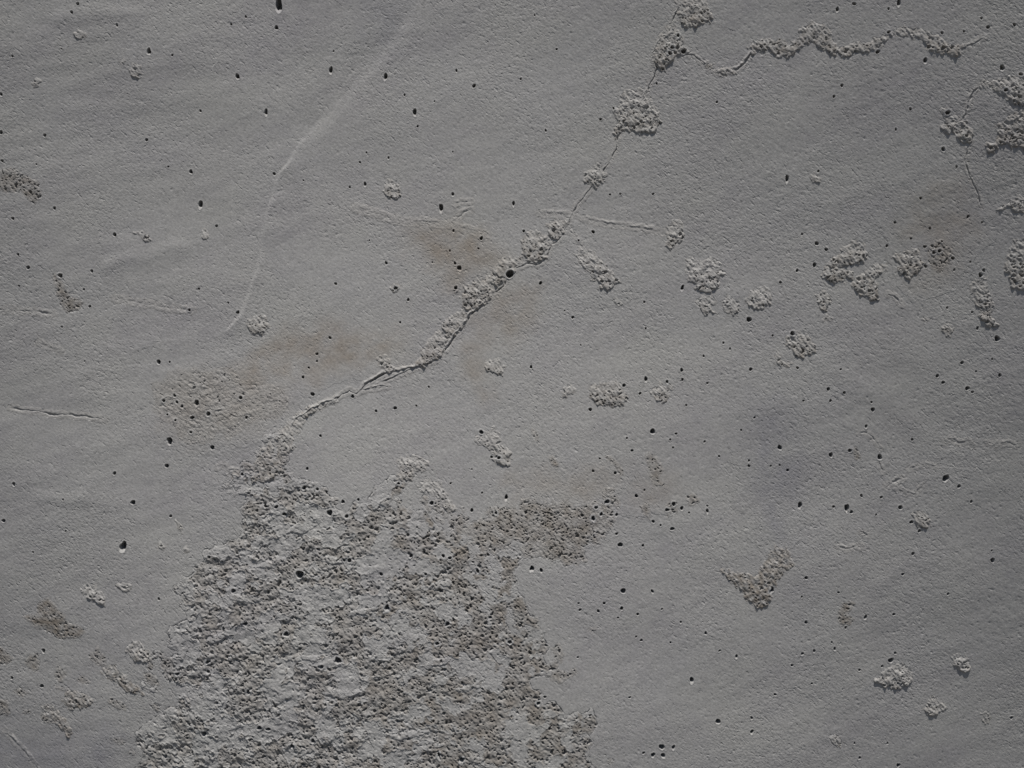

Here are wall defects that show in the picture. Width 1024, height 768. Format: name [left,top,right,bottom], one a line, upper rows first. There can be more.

crack [641,0,988,101]
hole [0,167,42,205]
spalling [611,87,663,141]
crack [958,82,985,210]
crack [250,127,666,484]
spalling [684,255,772,317]
spalling [814,239,952,323]
crack [6,404,109,425]
spalling [0,366,629,768]
spalling [720,542,795,612]